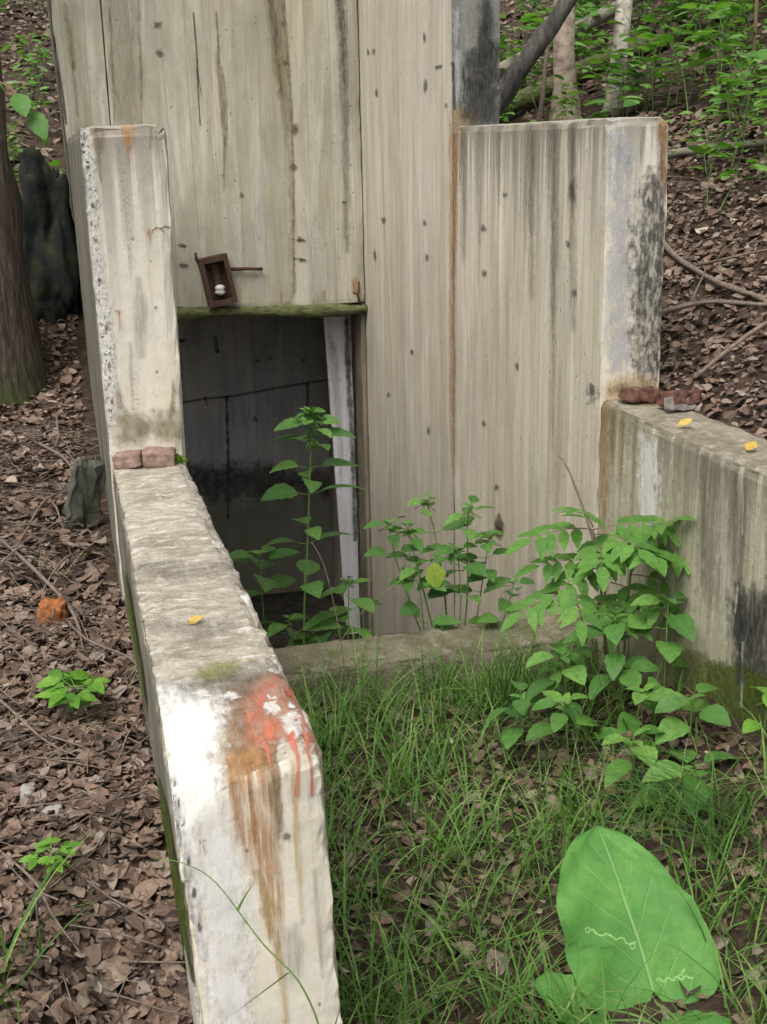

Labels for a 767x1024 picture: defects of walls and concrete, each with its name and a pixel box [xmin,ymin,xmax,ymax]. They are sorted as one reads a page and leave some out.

water stain [435,0,500,125]
corrosion [449,128,462,289]
water stain [629,160,667,386]
water stain [186,397,330,519]
water stain [727,585,767,709]
peeling [247,687,306,739]
corrosion [228,746,281,933]